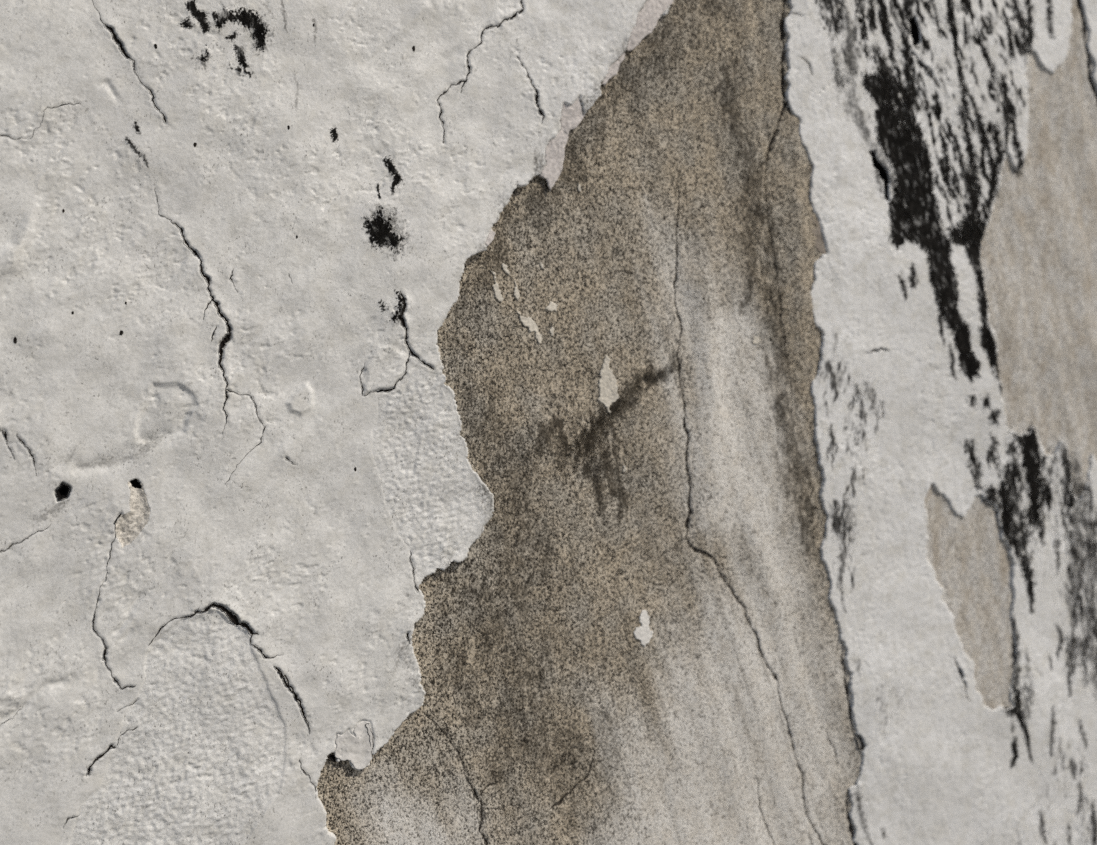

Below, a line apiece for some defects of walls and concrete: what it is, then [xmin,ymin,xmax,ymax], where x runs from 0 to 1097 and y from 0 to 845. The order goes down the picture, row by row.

crack [92,0,166,123]
mould [180,0,270,77]
crack [149,603,310,732]
mould [361,155,405,261]
crack [360,290,434,396]
damp [439,362,678,792]
peeling [316,0,865,845]
crack [674,184,824,845]
mould [816,0,1097,697]
peeling [924,484,1015,710]
mould [1002,618,1033,768]
peeling [981,0,1097,500]